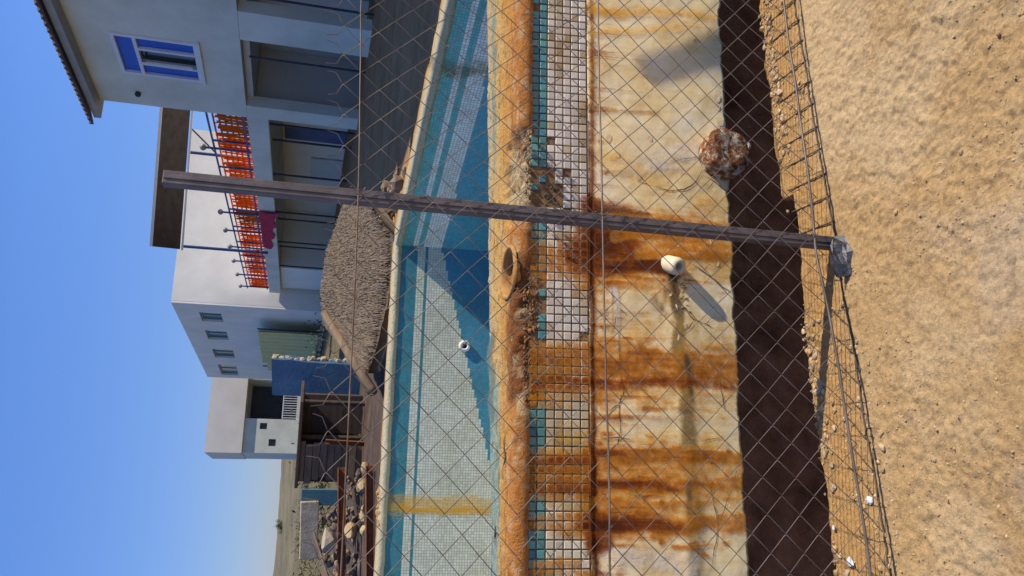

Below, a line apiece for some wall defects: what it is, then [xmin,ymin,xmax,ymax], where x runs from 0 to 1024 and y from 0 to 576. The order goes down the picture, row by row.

spalling [518,129,562,207]
rust [577,0,729,226]
spalling [522,260,539,410]
rust [528,226,746,576]
rust [387,495,492,515]